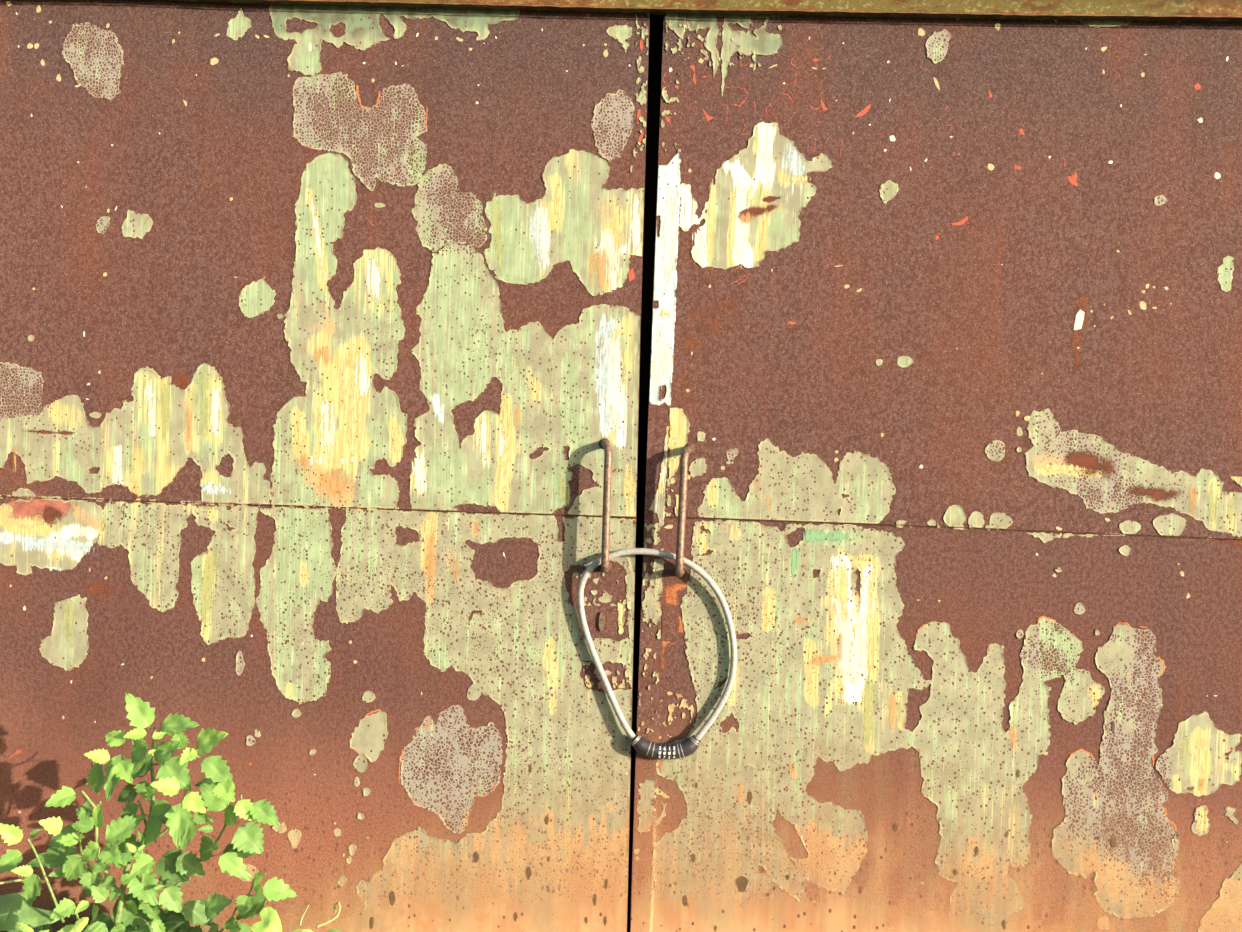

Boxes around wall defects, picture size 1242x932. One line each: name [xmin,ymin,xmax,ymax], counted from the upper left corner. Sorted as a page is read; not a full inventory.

peeling [1079,20,1131,28]
peeling [925,29,952,64]
peeling [879,180,899,204]
peeling [1154,195,1167,206]
peeling [1217,256,1234,292]
peeling [876,356,914,368]
peeling [0,4,833,905]
peeling [985,408,1242,556]
corrosion [662,584,687,668]
peeling [637,438,1242,932]